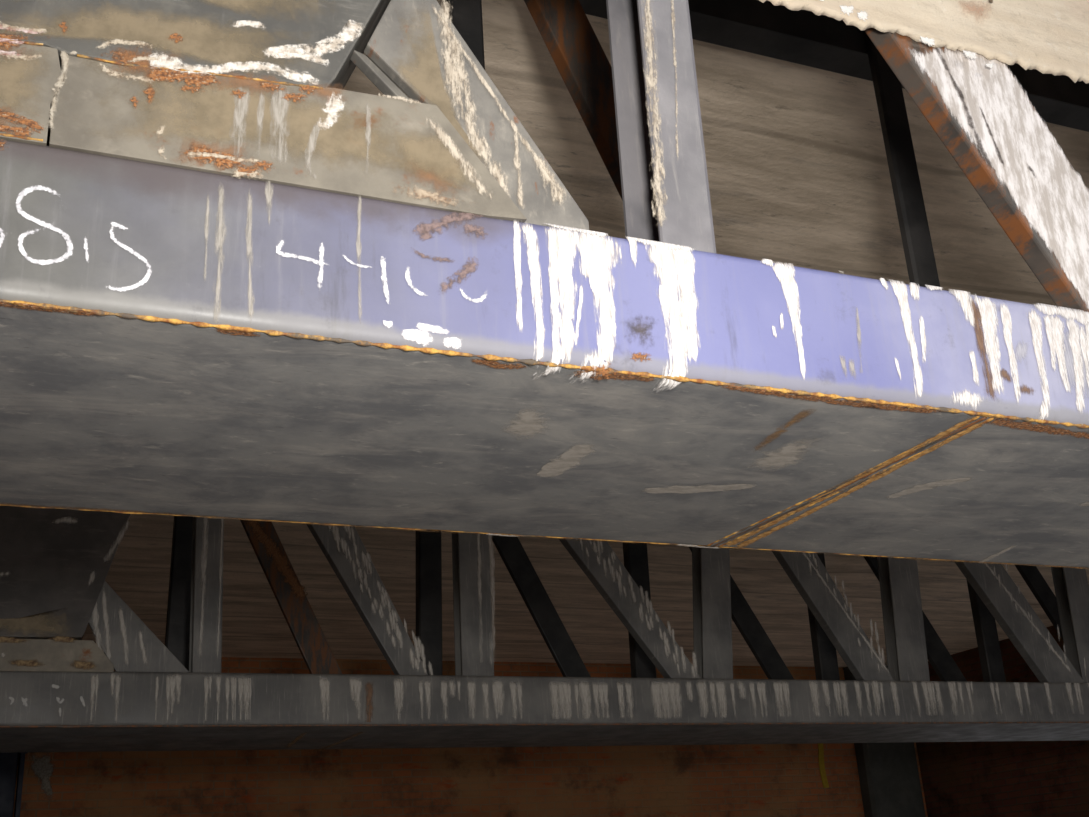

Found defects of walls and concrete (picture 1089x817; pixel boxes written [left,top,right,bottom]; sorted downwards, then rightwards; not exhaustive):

corrosion [112,49,218,107]
damp [0,0,407,178]
damp [379,0,563,206]
damp [644,0,668,225]
corrosion [395,137,485,239]
damp [880,47,1089,420]
damp [514,221,700,389]
corrosion [570,363,654,382]
damp [762,259,806,379]
corrosion [721,385,940,447]
corrosion [726,414,1089,551]
corrosion [972,300,1034,397]